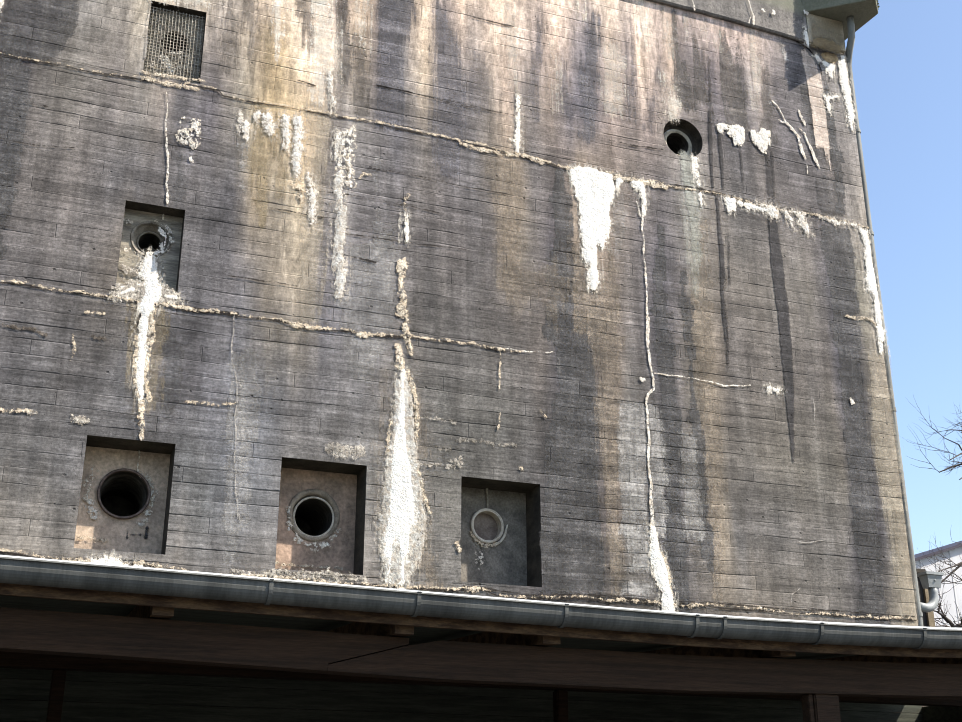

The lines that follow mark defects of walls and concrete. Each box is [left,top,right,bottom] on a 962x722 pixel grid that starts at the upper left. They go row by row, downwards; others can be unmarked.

damp [0,0,79,260]
efflorescence [117,248,181,440]
crack [0,0,574,220]
damp [236,0,372,301]
damp [370,0,416,131]
damp [399,193,410,242]
damp [428,0,466,177]
crack [0,171,918,622]
damp [539,164,647,597]
damp [617,8,891,625]
crack [772,100,820,174]